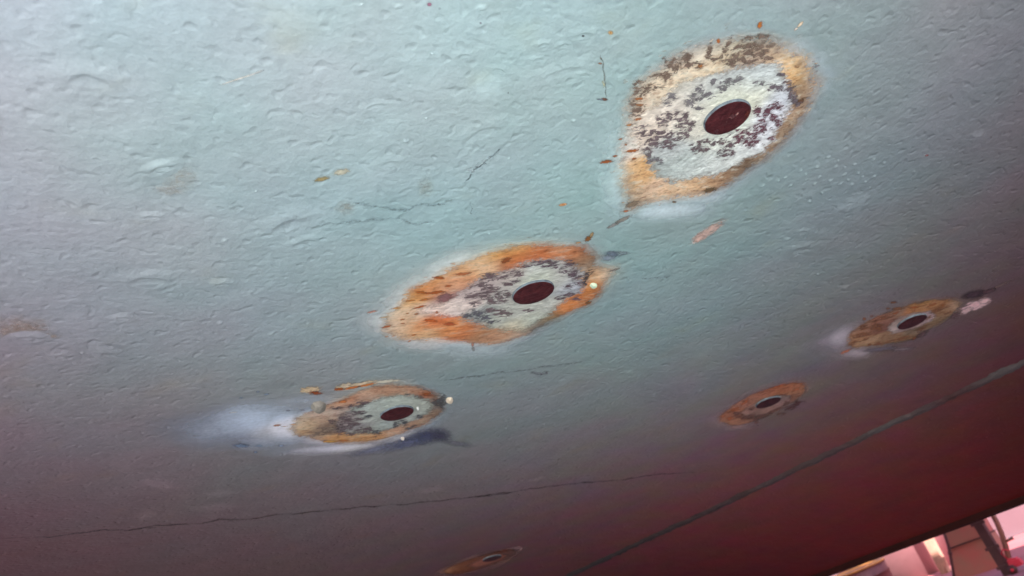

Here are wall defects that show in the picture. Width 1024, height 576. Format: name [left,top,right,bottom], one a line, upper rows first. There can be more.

rust [600,22,822,228]
rust [368,232,620,351]
rust [822,299,961,355]
rust [185,379,447,453]
rust [719,383,805,427]